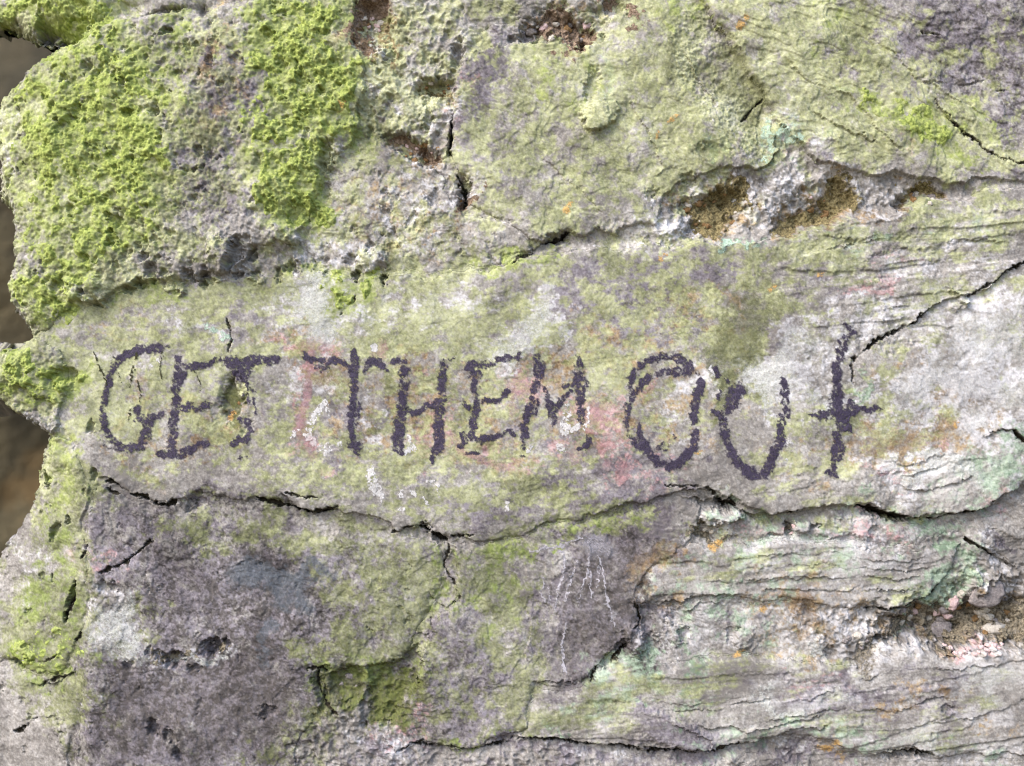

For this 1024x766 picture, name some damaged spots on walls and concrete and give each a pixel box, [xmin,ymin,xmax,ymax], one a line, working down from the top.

crack [936,103,1024,164]
crack [449,124,468,210]
crack [513,231,568,263]
crack [968,261,1024,296]
crack [851,313,923,377]
crack [106,478,178,507]
crack [258,492,333,513]
crack [665,484,735,506]
crack [81,539,152,573]
crack [393,524,471,599]